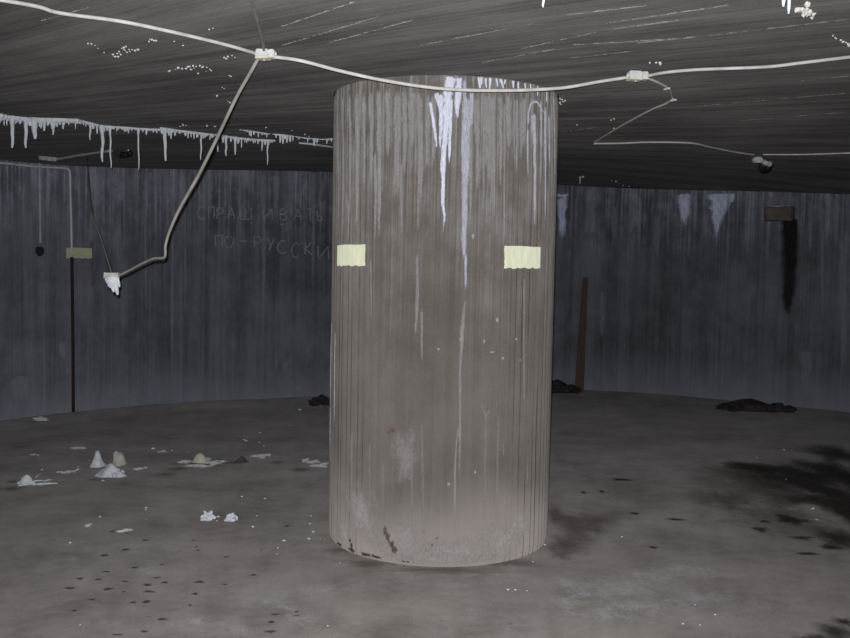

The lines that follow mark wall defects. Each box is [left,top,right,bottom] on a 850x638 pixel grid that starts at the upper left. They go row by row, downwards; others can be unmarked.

efflorescence [0,114,279,142]
damp [291,77,566,285]
efflorescence [678,194,690,225]
efflorescence [708,193,735,234]
efflorescence [415,256,423,357]
damp [782,220,797,311]